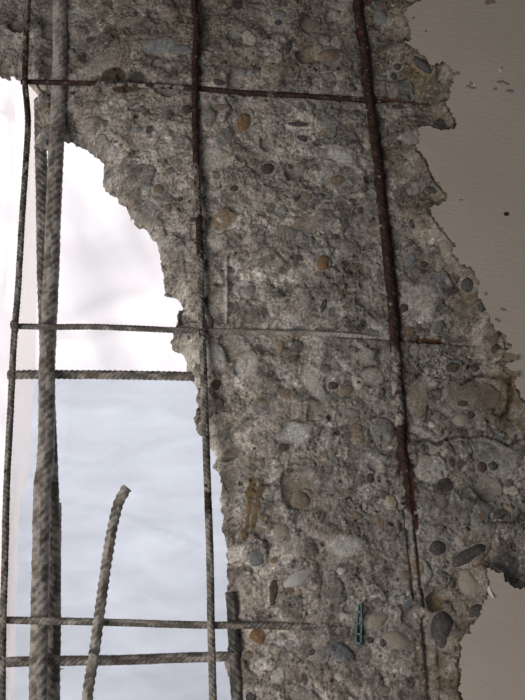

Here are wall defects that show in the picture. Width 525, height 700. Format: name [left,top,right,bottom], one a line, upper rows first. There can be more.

spalling [0,0,53,151]
spalling [64,0,202,436]
spalling [197,0,525,700]
rust [384,176,419,530]